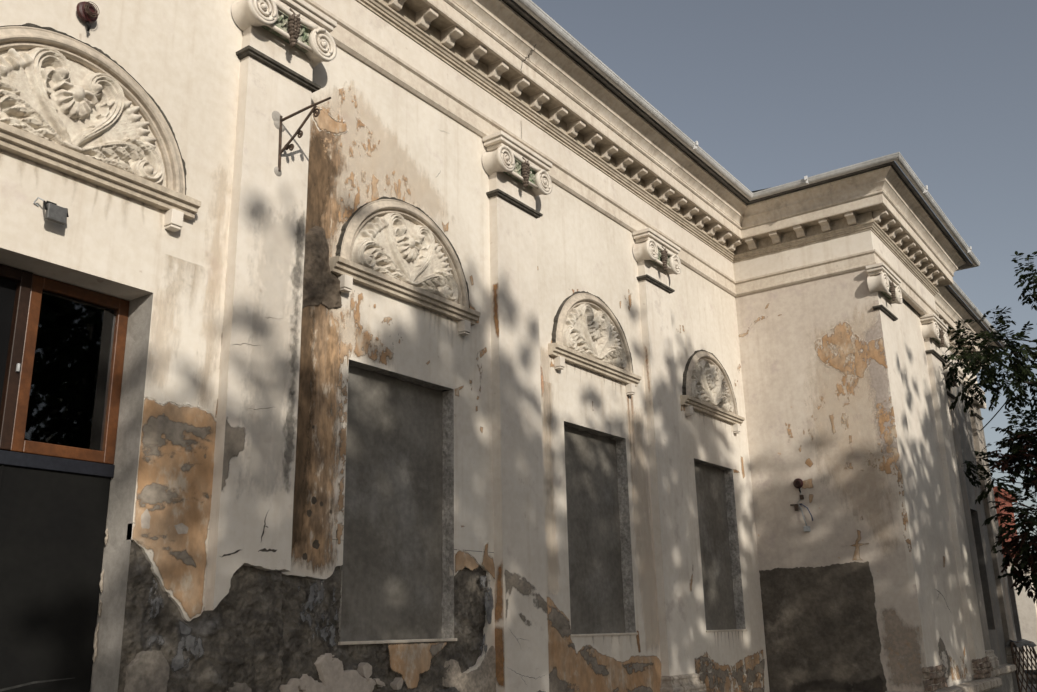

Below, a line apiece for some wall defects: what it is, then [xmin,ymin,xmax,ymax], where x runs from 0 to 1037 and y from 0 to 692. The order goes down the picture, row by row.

peeling [312,102,380,157]
peeling [338,171,411,222]
crack [220,512,277,557]
spalling [118,396,496,692]
damp [284,114,346,572]
peeling [336,293,402,544]
peeling [785,319,888,503]
peeling [869,397,912,552]
peeling [547,597,662,692]
peeling [694,648,765,692]